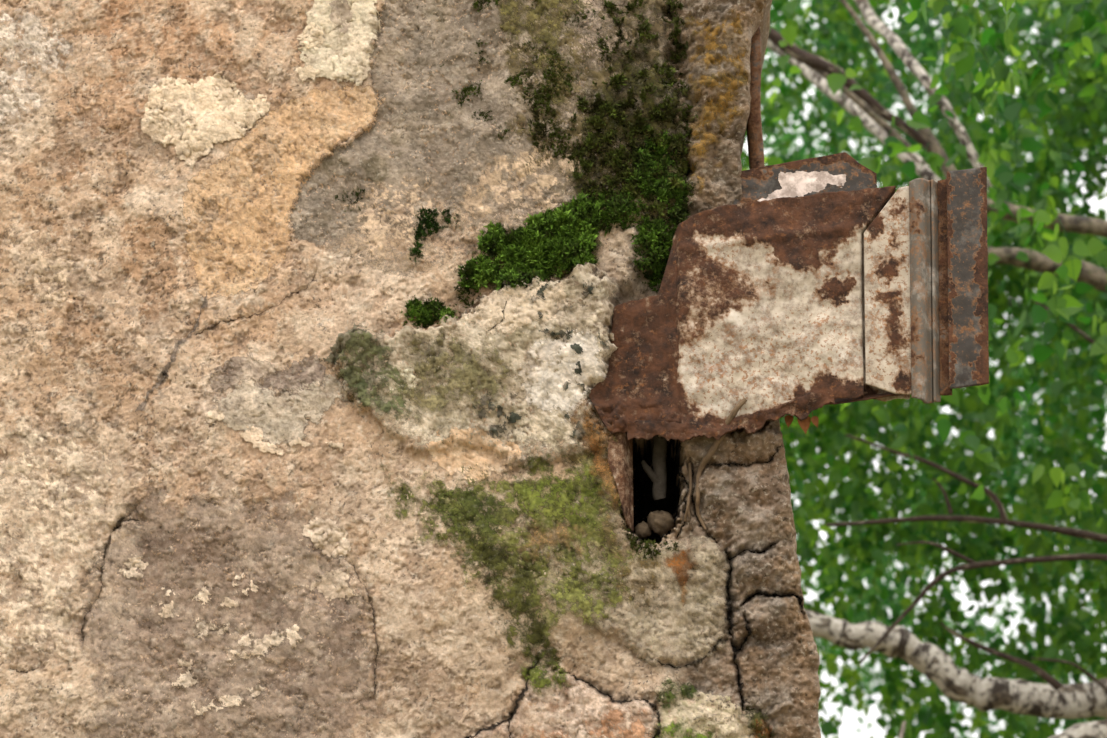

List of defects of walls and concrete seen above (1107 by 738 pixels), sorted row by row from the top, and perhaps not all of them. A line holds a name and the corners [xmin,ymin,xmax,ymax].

crack [135,277,314,412]
rust [627,392,835,442]
peeling [583,432,731,666]
crack [650,445,804,709]
crack [464,662,661,738]
spalling [476,663,768,738]